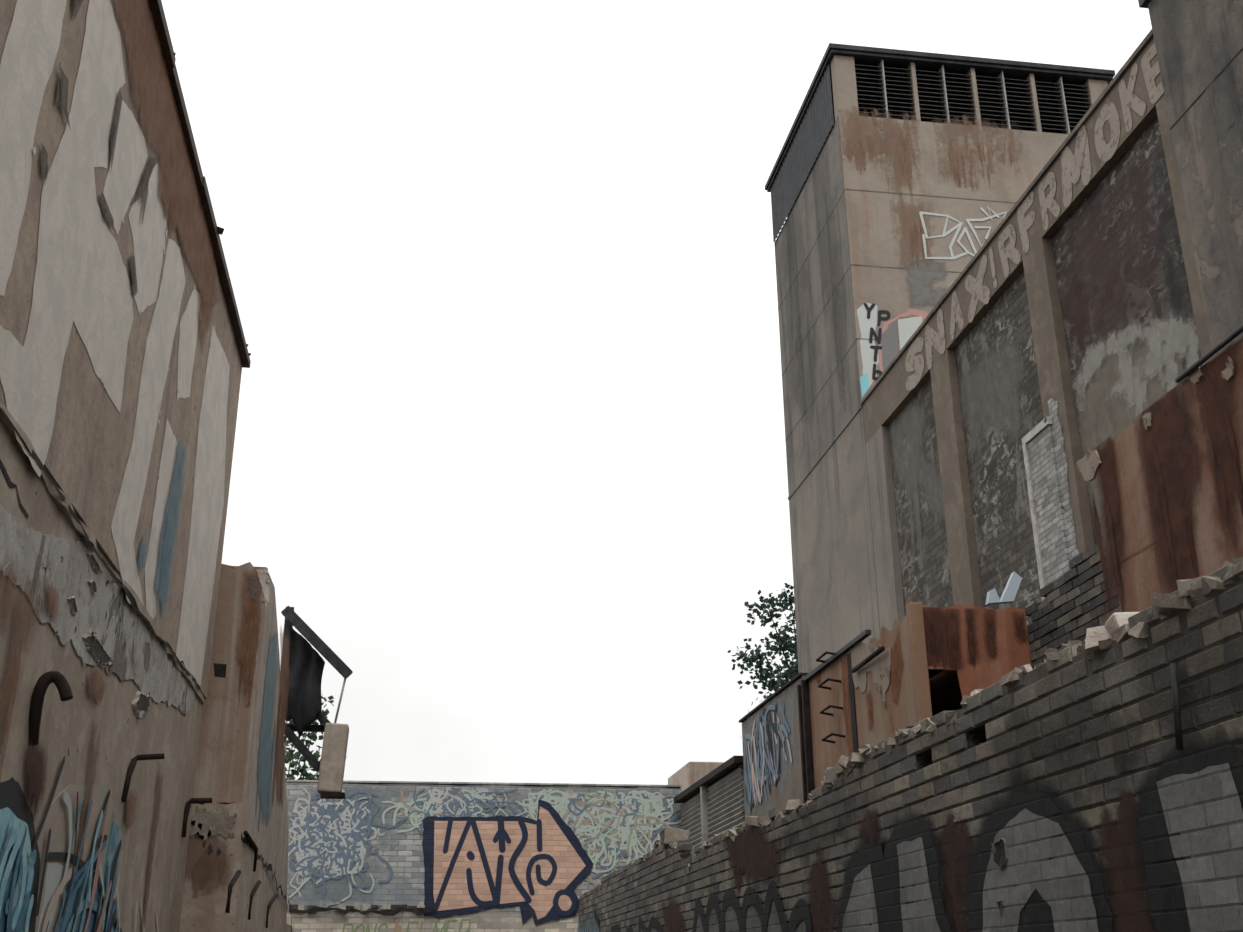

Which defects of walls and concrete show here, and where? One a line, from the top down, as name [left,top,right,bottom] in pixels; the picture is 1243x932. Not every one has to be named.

corrosion [842,108,930,266]
corrosion [940,120,1014,188]
peeling [0,0,230,719]
peeling [1048,398,1102,560]
corrosion [1092,436,1124,618]
corrosion [1138,343,1243,593]
corrosion [923,607,997,669]
spalling [966,724,987,749]
spalling [189,805,237,841]